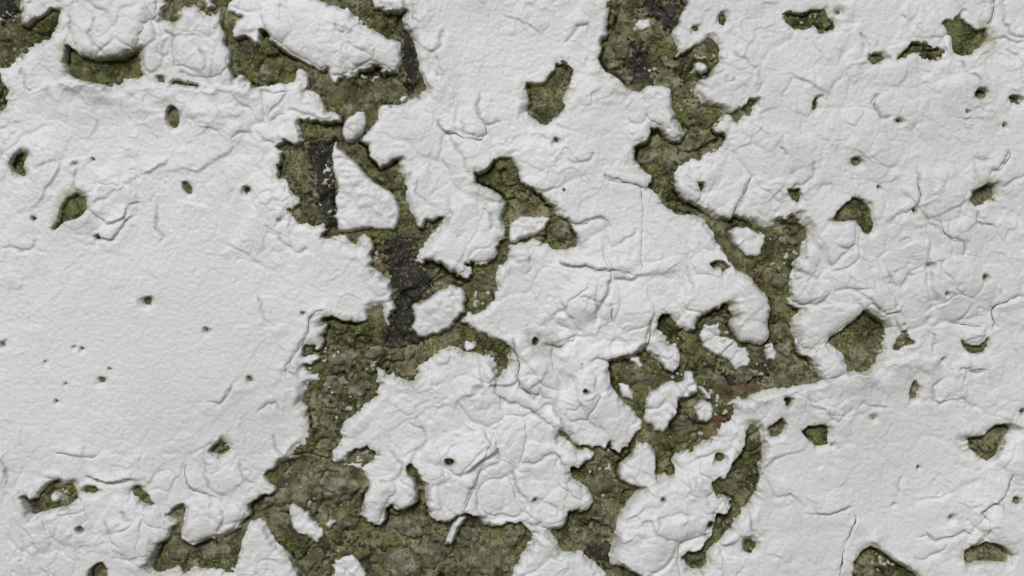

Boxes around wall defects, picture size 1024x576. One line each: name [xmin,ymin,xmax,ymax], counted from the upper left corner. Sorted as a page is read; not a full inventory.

spalling [782,8,835,33]
spalling [898,13,986,61]
spalling [53,194,87,229]
crack [560,174,645,274]
spalling [152,0,577,576]
spalling [551,0,821,576]
spalling [828,311,914,373]
spalling [802,425,828,446]
spalling [967,424,1009,461]
spalling [26,480,99,514]
crack [839,515,856,576]
spalling [852,546,915,576]